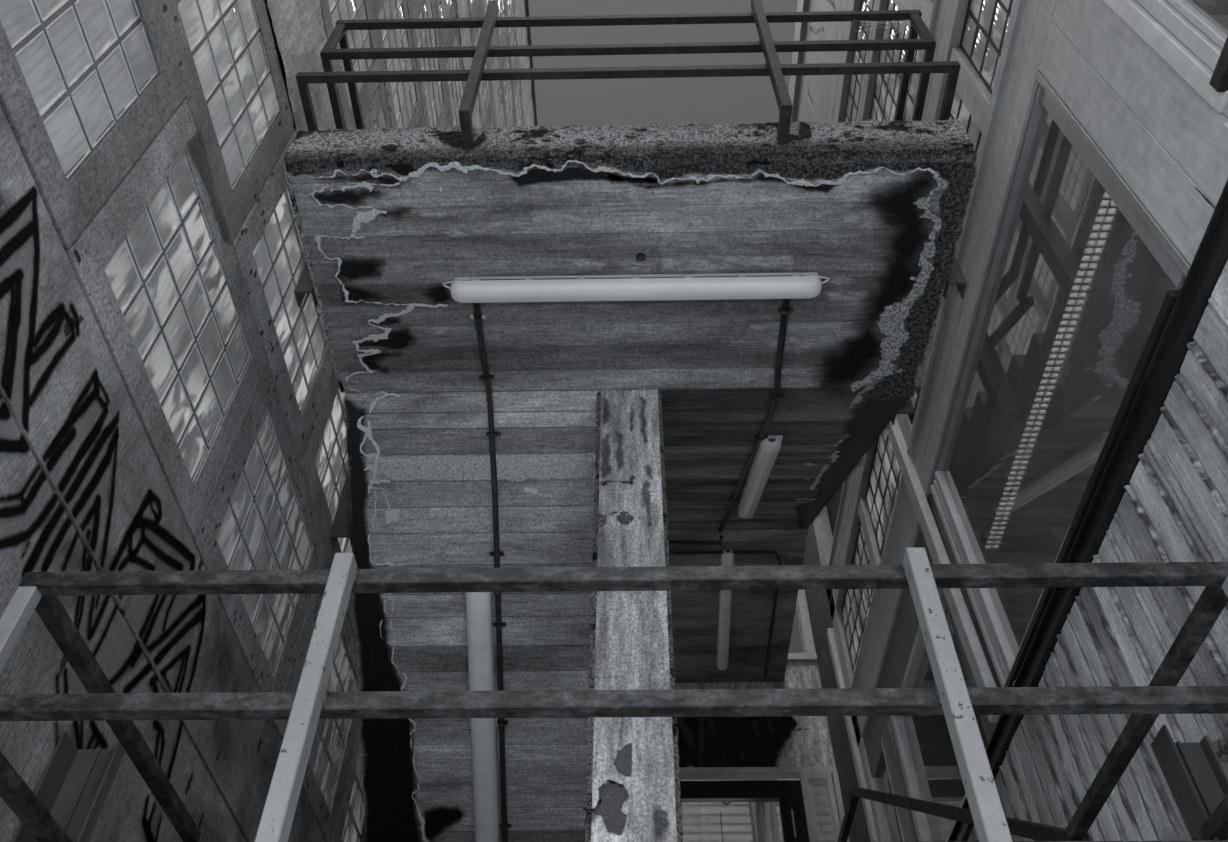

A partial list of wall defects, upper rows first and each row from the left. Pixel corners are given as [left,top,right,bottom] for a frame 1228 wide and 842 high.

damp [309,160,948,569]
damp [353,593,407,692]
damp [361,719,464,842]
spalling [587,743,632,835]
damp [654,809,667,837]